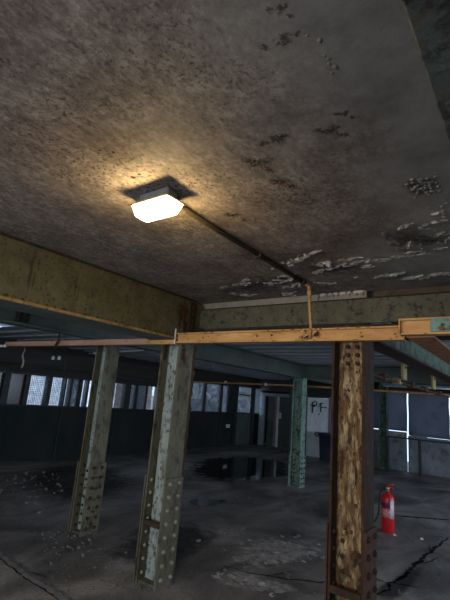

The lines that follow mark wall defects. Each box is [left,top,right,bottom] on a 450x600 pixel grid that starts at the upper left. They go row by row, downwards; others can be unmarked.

peeling [219,250,322,297]
spalling [313,282,364,300]
peeling [372,272,450,281]
crack [0,551,74,600]
crack [377,537,448,597]